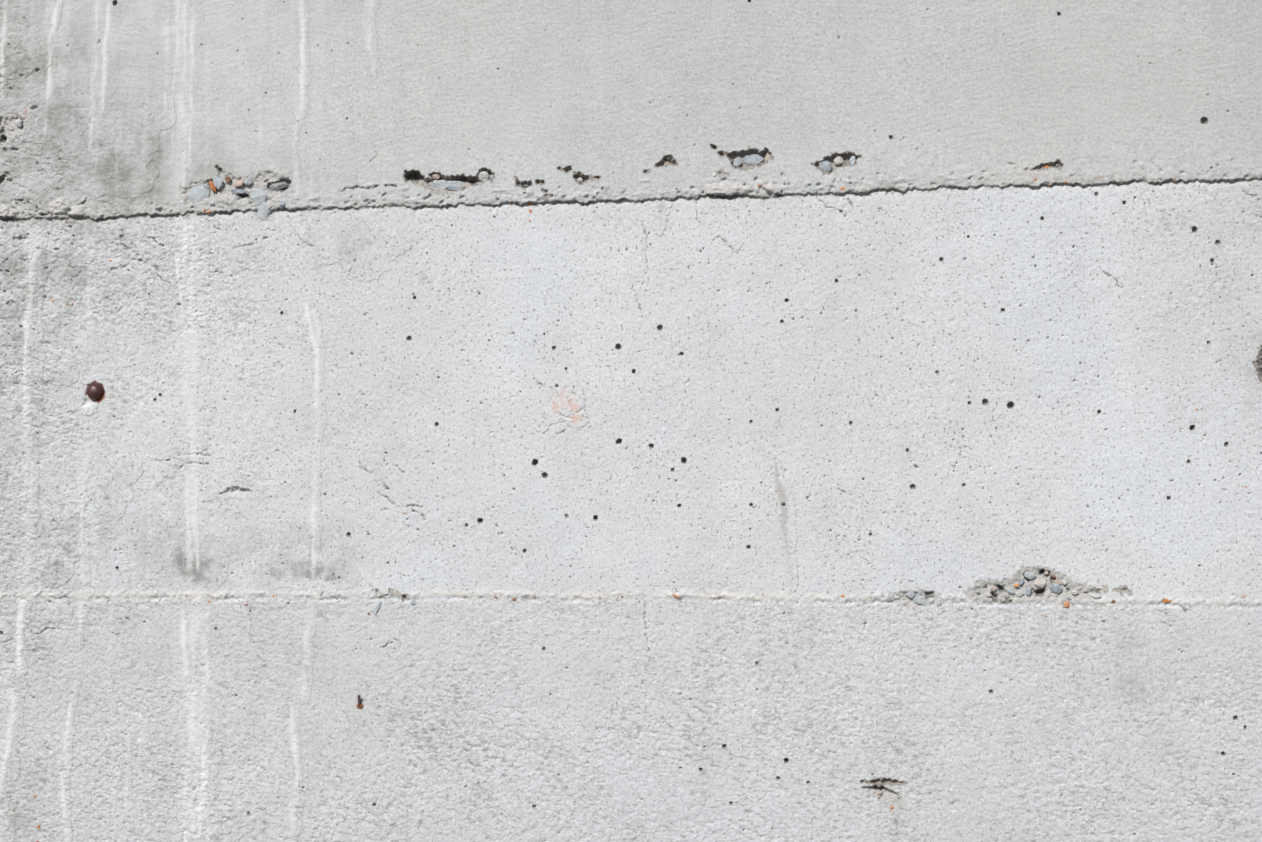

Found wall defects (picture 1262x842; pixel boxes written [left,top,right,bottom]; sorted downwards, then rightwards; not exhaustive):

damp [289,0,311,199]
spalling [0,109,28,147]
spalling [178,164,292,222]
spalling [402,167,495,195]
spalling [710,144,774,177]
spalling [810,151,862,175]
damp [290,216,412,282]
spalling [1252,345,1262,382]
damp [0,0,231,842]
damp [252,300,360,842]
spalling [963,565,1133,617]